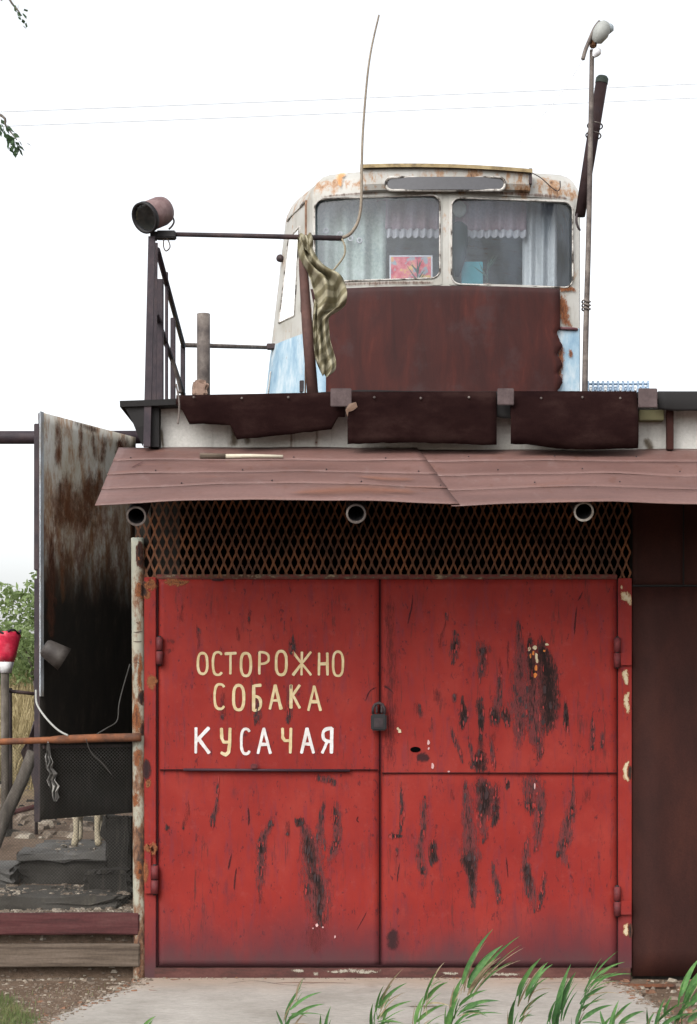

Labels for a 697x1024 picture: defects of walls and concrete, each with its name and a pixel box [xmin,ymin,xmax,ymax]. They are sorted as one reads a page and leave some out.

corrosion [136,541,144,568]
spalling [622,669,630,714]
peeling [450,617,569,913]
peeling [556,768,588,869]
spalling [622,761,632,782]
peeling [286,801,343,938]